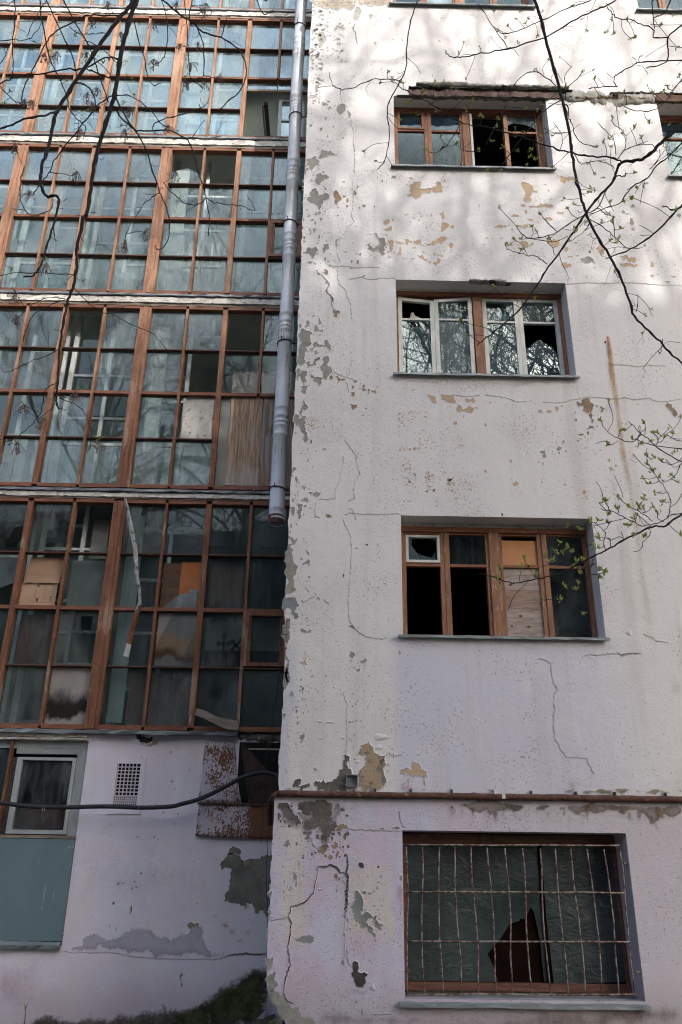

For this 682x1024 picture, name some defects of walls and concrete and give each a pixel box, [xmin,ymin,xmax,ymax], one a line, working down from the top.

flaking render [292,0,605,468]
peeling [619,250,677,283]
crack [303,441,401,640]
crack [538,658,595,774]
corrosion [195,741,280,839]
flaking render [220,695,428,938]
peeling [74,921,214,957]
crack [64,811,406,1004]
flaking render [264,956,316,1024]
flaking render [341,959,370,988]